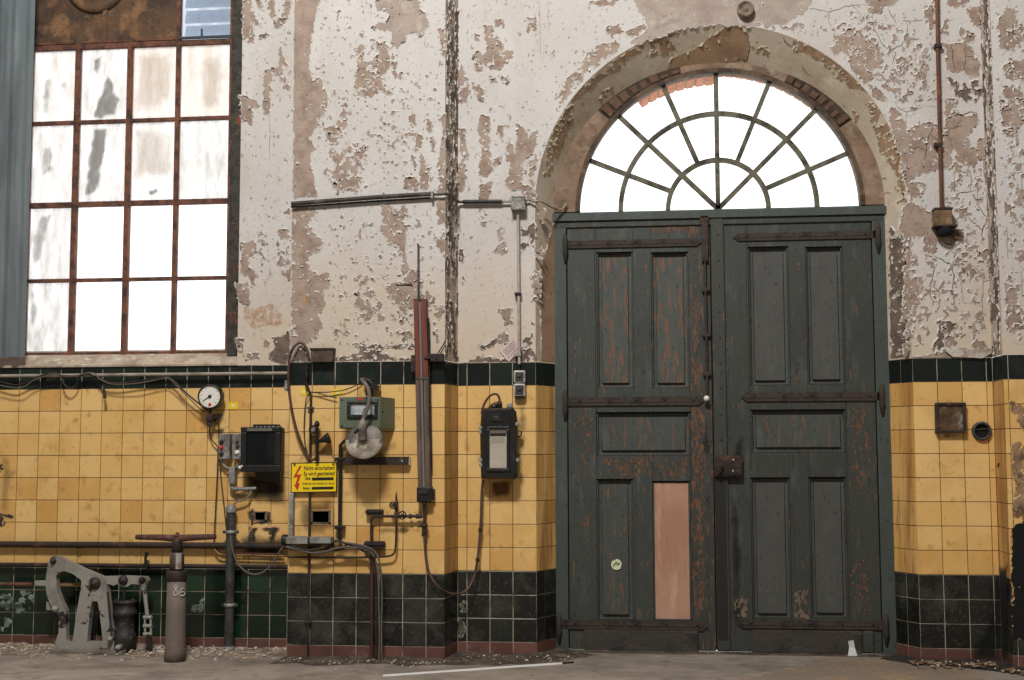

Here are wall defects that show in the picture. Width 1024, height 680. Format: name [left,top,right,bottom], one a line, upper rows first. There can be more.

peeling [234,0,1024,365]
crack [874,86,975,159]
crack [925,155,1023,311]